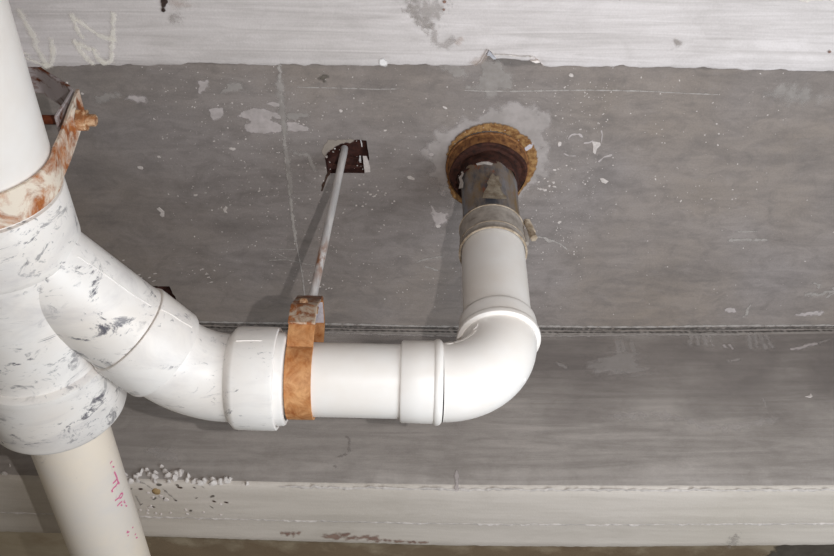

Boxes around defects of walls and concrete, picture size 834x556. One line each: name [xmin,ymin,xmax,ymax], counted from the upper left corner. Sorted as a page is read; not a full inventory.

corrosion [321,139,370,191]
corrosion [447,172,464,204]
corrosion [446,123,538,196]
leakage [768,544,834,556]